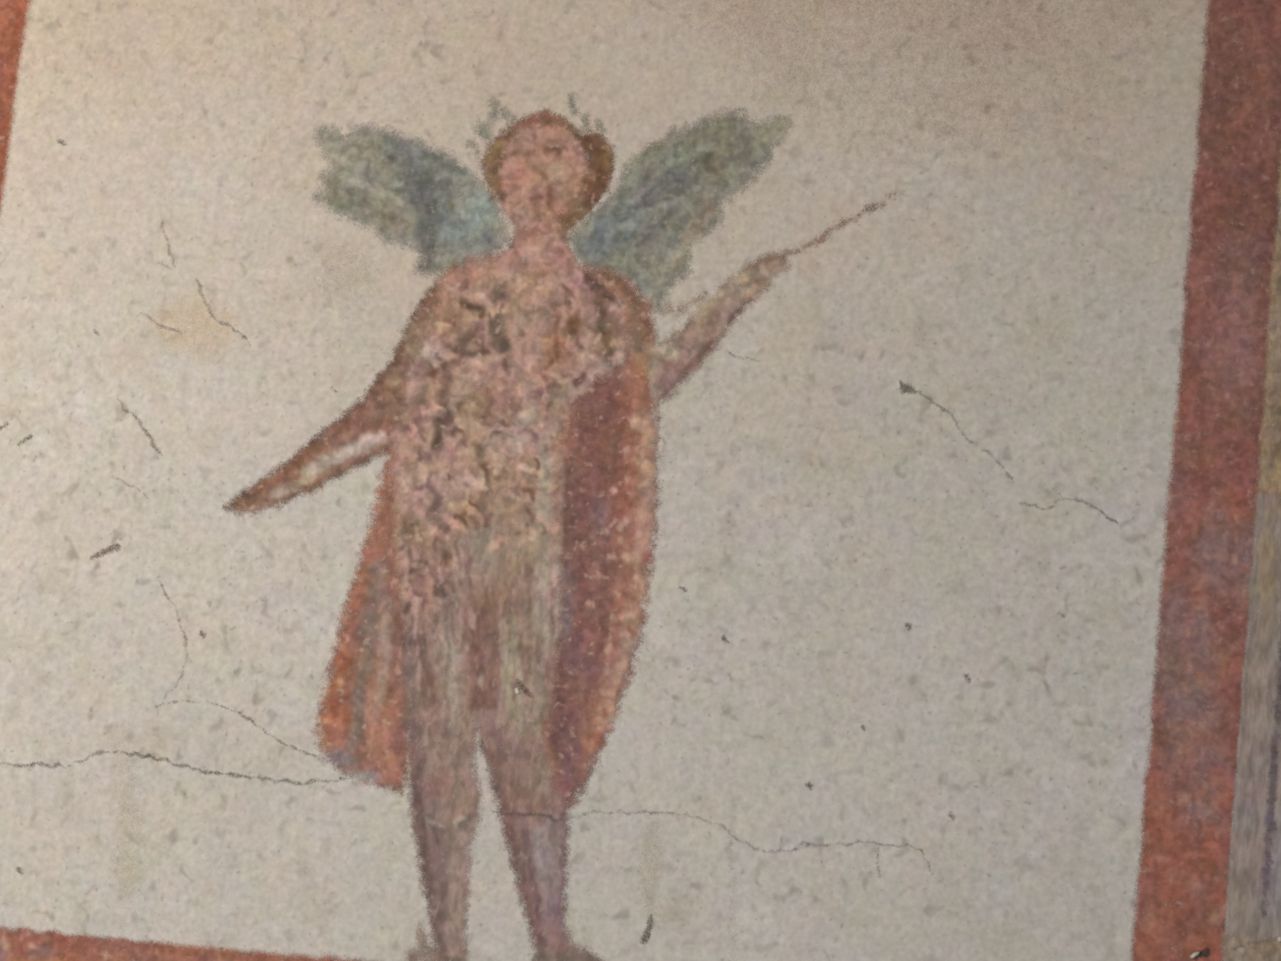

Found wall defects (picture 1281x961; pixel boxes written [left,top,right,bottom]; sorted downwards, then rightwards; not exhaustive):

crack [919,391,1118,524]
crack [493,809,945,885]